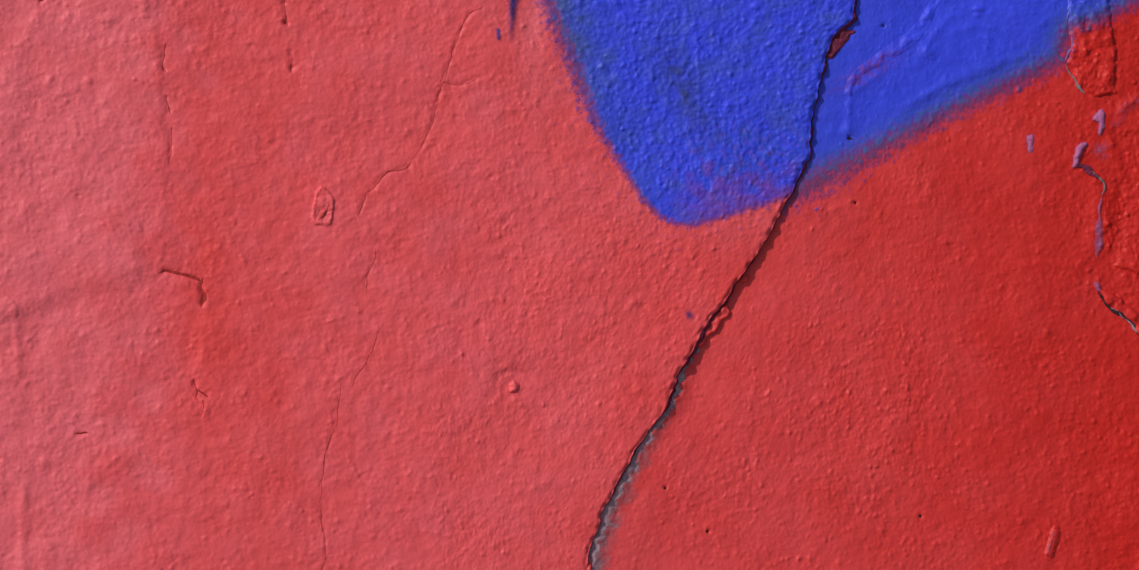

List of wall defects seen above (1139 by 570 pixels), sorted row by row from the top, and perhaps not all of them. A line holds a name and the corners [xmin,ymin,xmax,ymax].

crack [586,0,857,570]